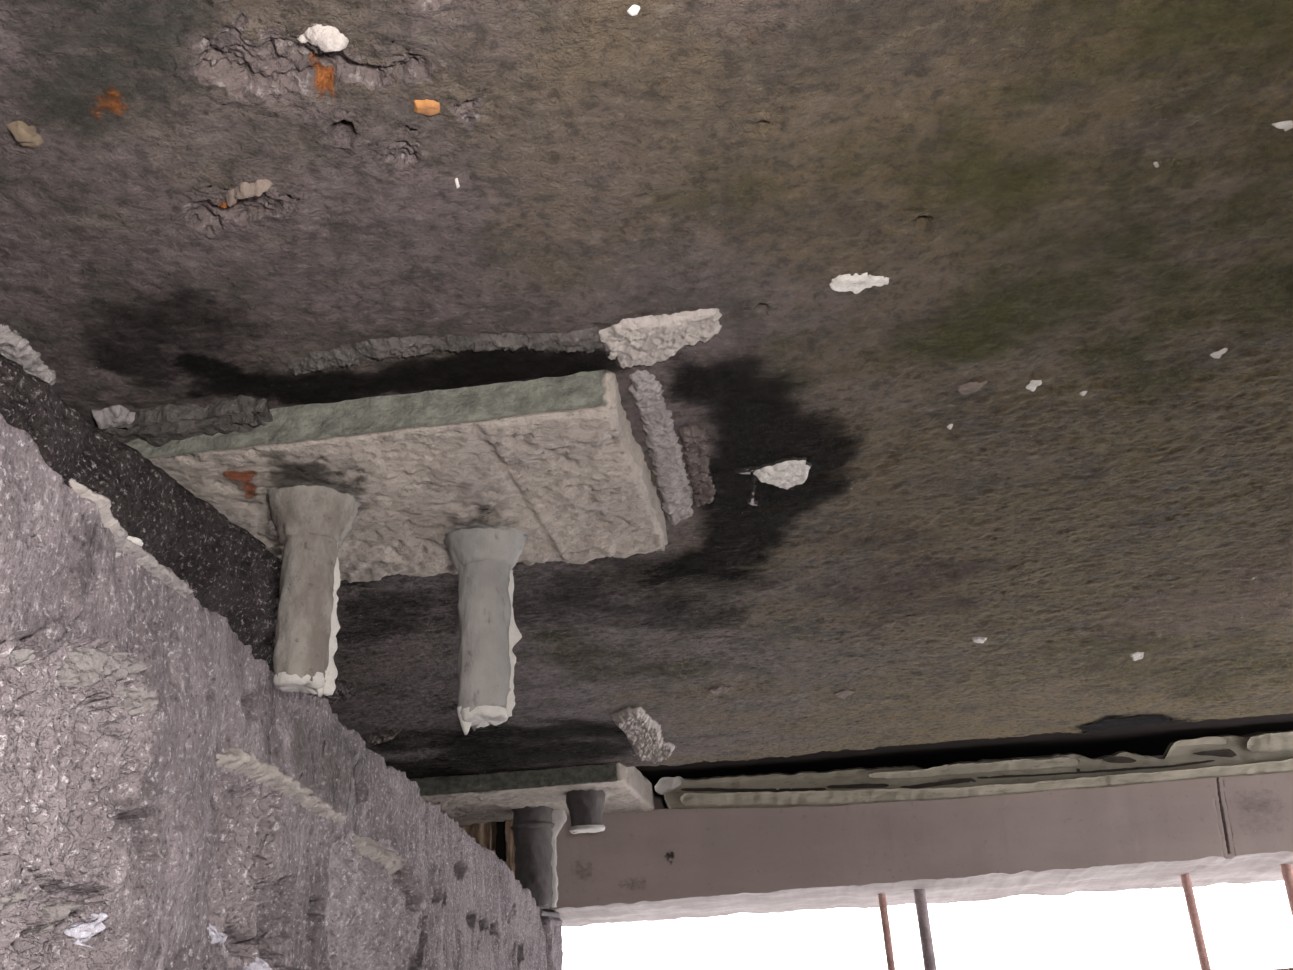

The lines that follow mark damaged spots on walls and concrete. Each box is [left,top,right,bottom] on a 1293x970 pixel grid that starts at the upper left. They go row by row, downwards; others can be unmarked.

spalling [172,0,498,182]
spalling [166,177,301,240]
crack [270,959,329,970]
crack [514,939,525,970]